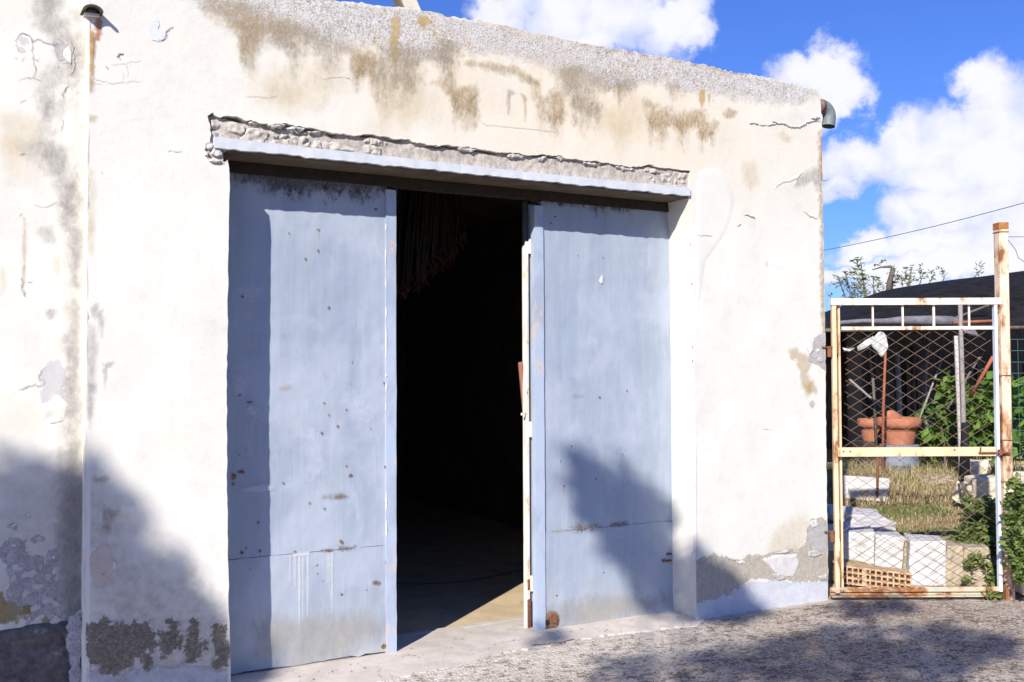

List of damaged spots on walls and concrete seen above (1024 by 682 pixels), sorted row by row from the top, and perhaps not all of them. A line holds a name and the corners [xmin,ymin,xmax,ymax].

rust [89,18,102,83]
water stain [650,105,712,137]
crack [749,120,821,128]
spalling [204,115,690,187]
spalling [807,333,826,371]
peeling [17,360,66,403]
peeling [696,517,828,620]
peeling [0,523,230,682]
rust [545,611,560,629]